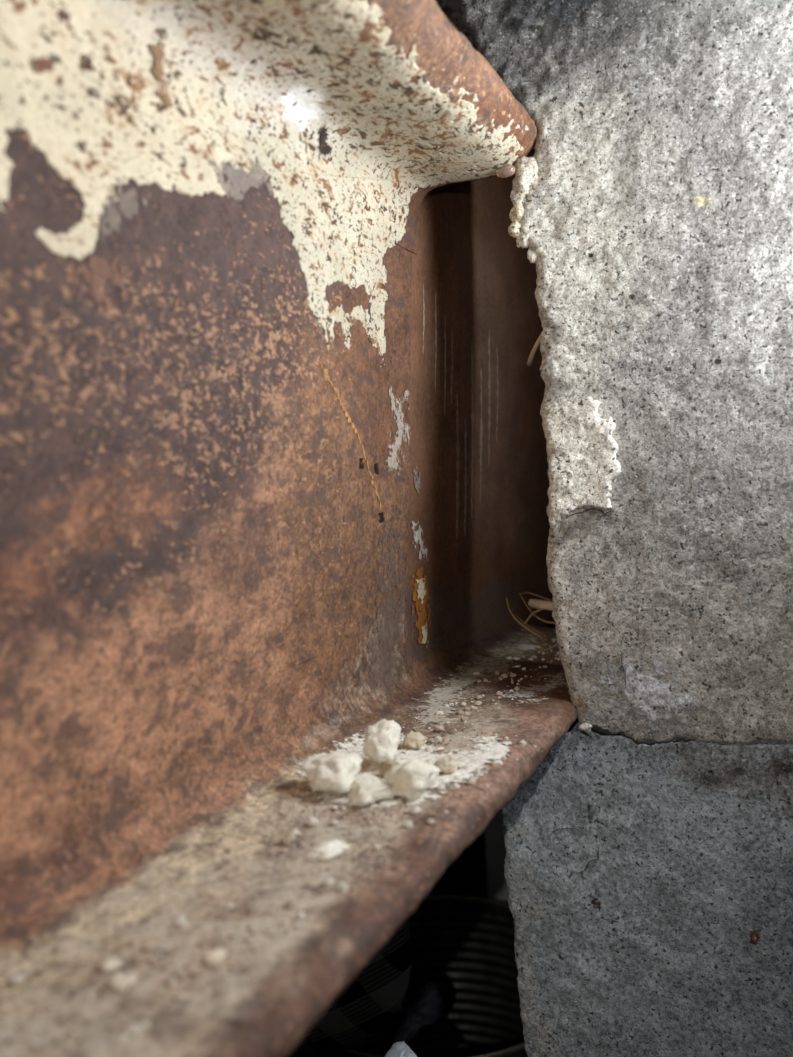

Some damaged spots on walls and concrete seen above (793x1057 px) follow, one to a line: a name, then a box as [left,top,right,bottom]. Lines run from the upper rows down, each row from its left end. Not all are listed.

peeling [0,0,529,367]
rust [320,362,381,511]
rust [412,567,432,649]